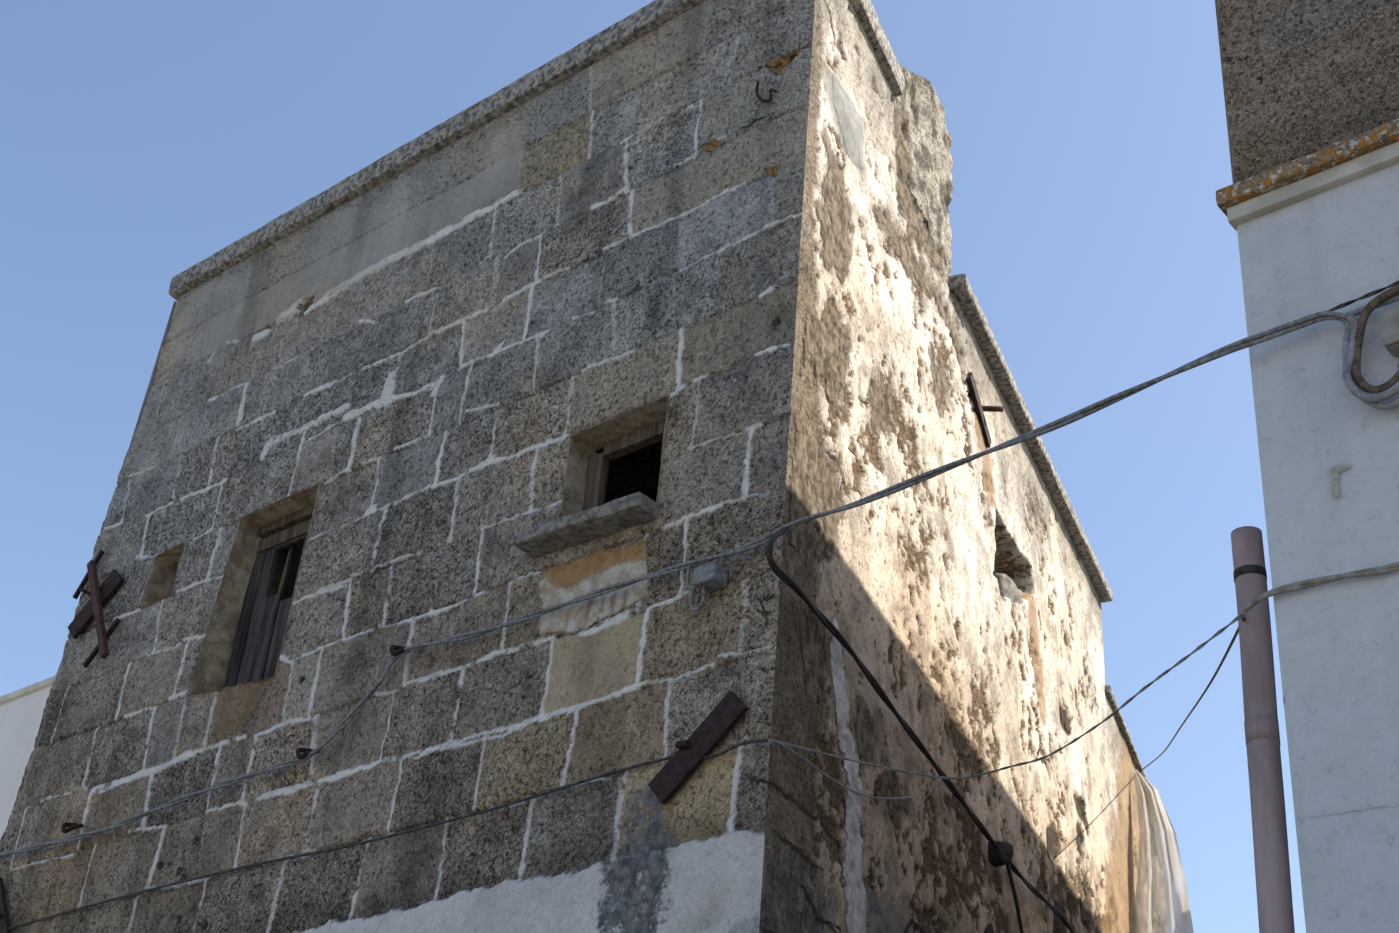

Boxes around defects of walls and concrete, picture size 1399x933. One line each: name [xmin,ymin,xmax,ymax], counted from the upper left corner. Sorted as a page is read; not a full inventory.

flaking render [873,97,966,418]
flaking render [785,119,893,730]
spalling [993,525,1033,605]
leakage [597,786,676,933]